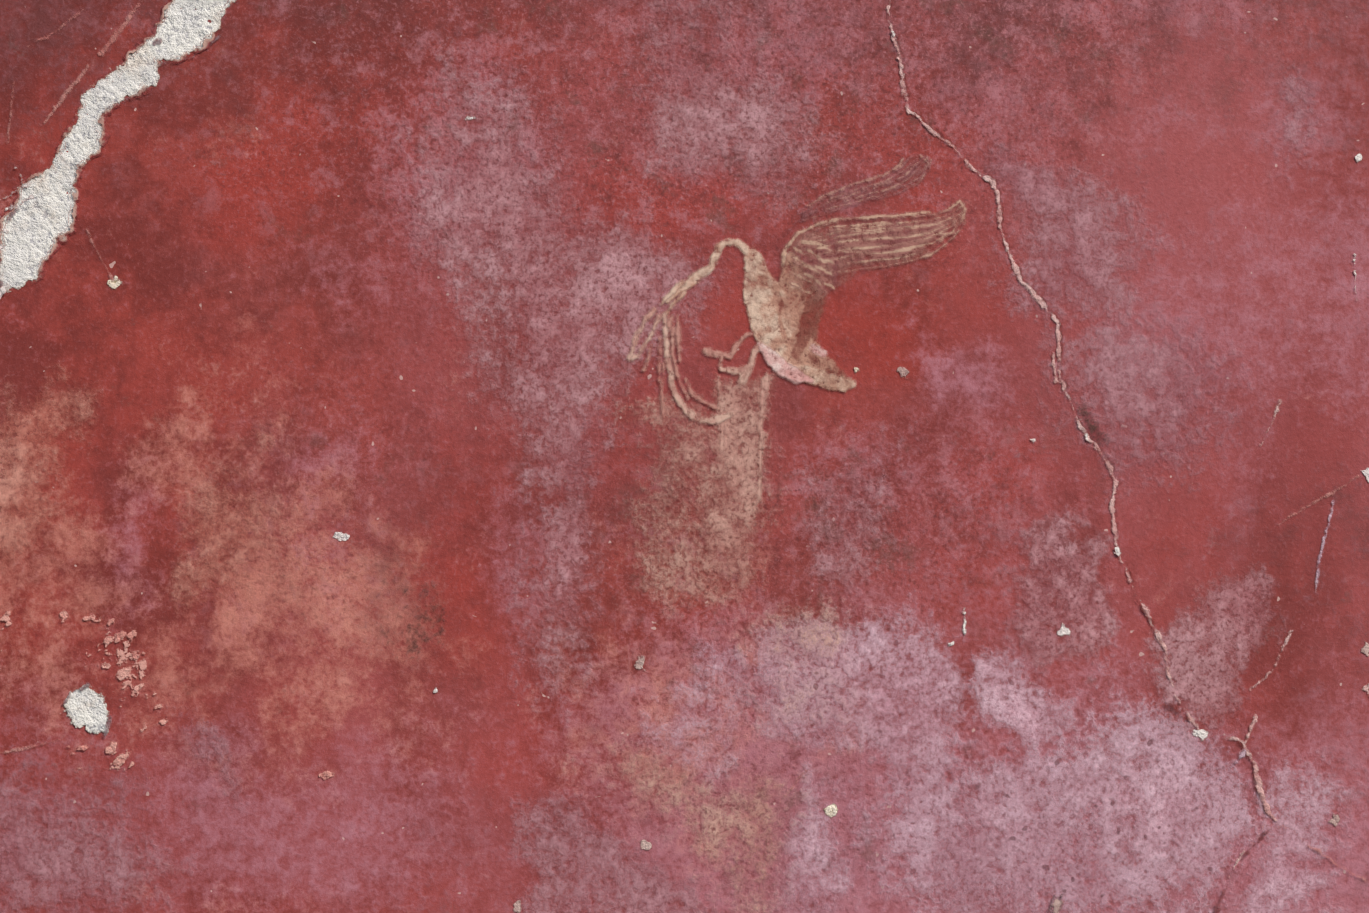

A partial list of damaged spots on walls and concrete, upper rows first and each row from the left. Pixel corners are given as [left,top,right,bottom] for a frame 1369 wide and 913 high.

crack [0,281,8,299]
crack [886,5,1277,913]
spalling [59,611,167,770]